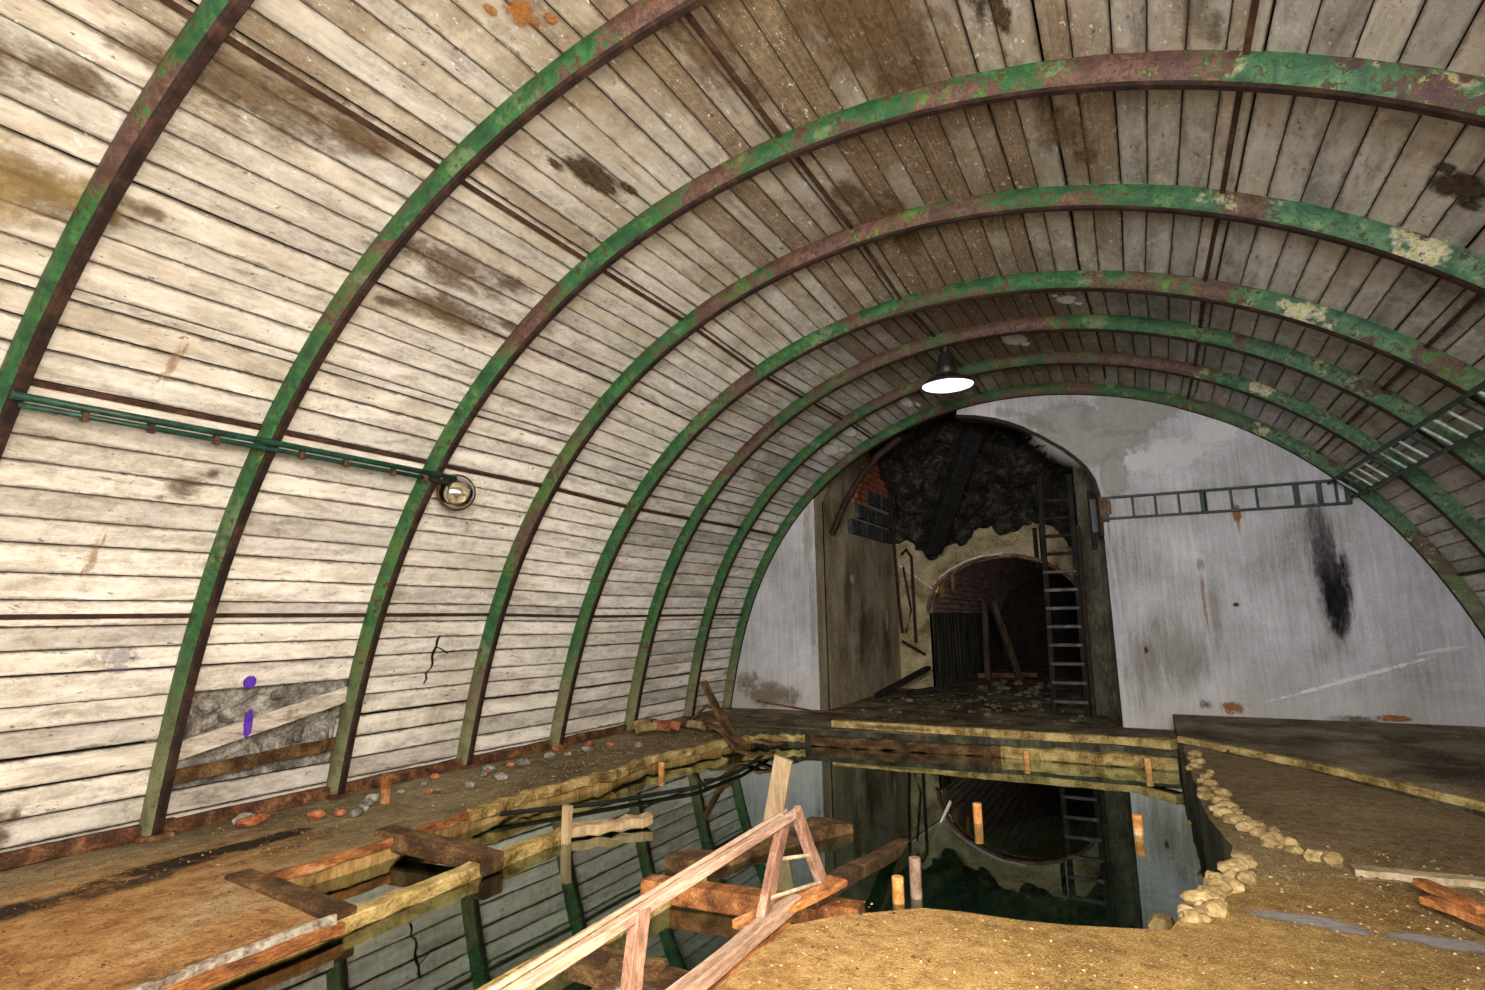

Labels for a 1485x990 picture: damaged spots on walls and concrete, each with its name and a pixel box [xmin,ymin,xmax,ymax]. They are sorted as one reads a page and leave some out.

corrosion [484,0,558,27]
water stain [970,0,1011,33]
water stain [547,156,638,195]
water stain [1426,163,1485,211]
water stain [1309,506,1350,636]
crack [423,635,448,684]